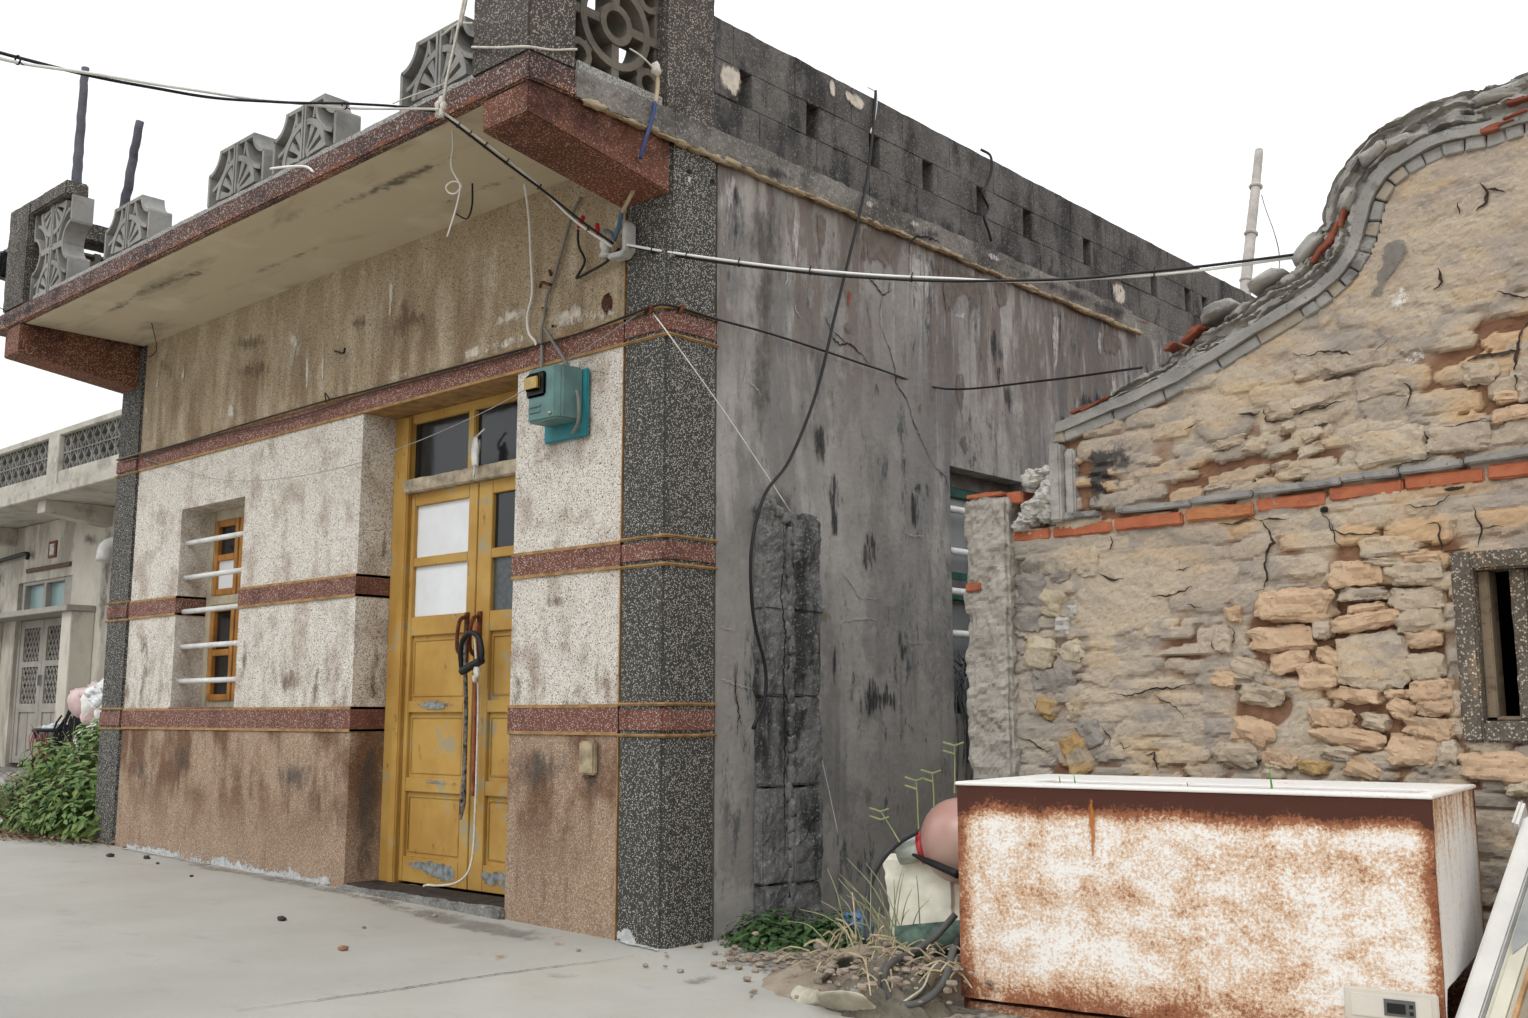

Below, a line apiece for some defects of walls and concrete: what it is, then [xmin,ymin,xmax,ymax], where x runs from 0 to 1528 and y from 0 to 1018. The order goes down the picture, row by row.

crack [1457,183,1505,215]
leakage [884,197,1125,369]
leakage [991,330,1013,414]
crack [1239,340,1387,439]
crack [1395,291,1528,466]
leakage [814,425,839,535]
leakage [911,484,921,527]
crack [1219,495,1503,592]
leakage [864,677,897,716]
spalling [1014,545,1105,775]
crack [1153,567,1241,691]
spalling [1210,535,1528,798]